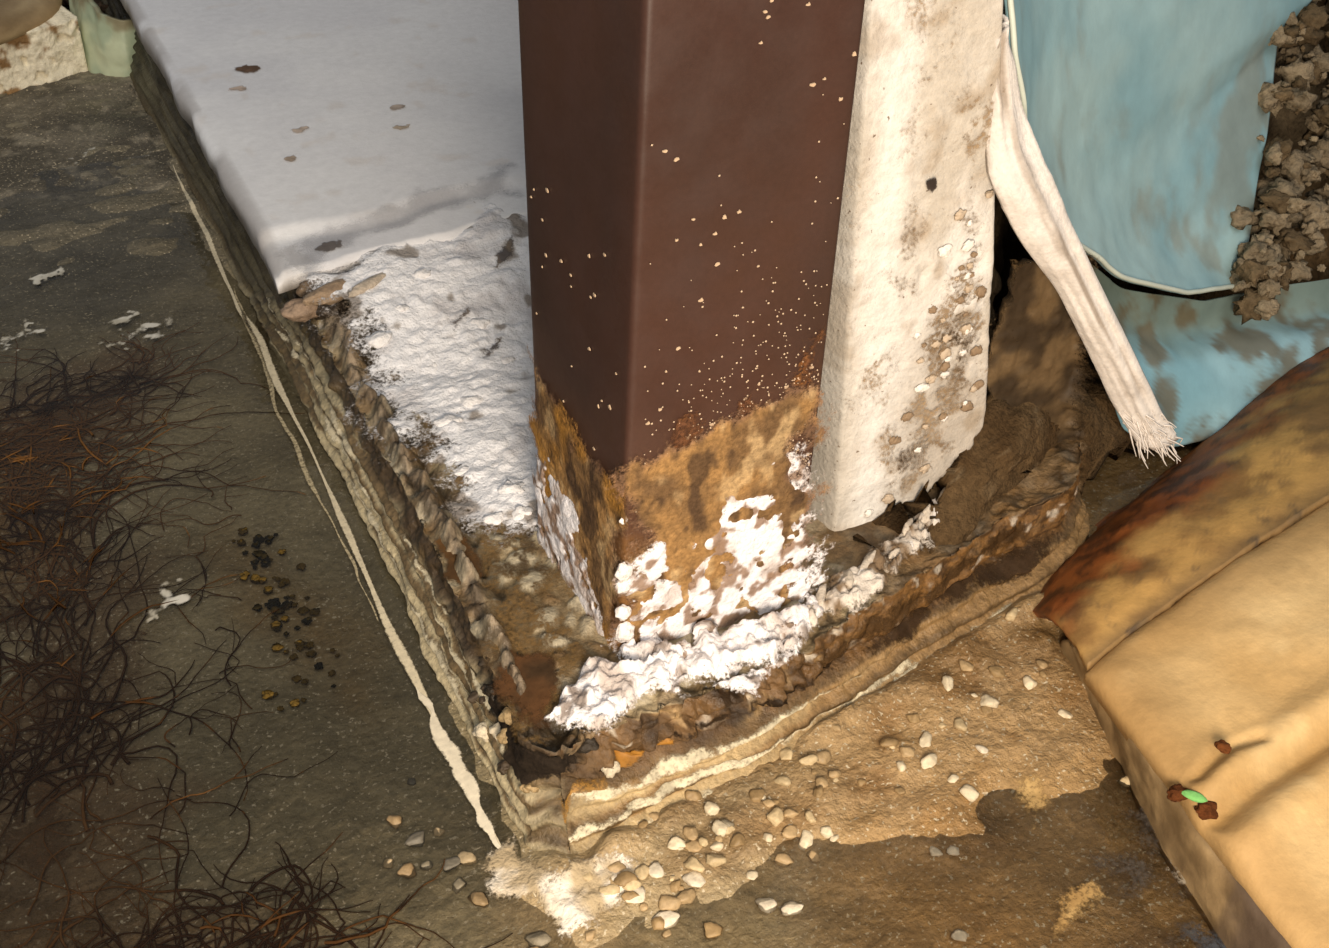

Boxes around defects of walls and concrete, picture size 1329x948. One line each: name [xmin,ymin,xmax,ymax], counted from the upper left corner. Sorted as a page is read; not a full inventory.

leakage [958,91,1004,161]
leakage [0,362,190,948]
spalling [467,656,599,793]
spalling [601,761,621,778]
leakage [173,165,1066,940]
rust [527,330,835,653]